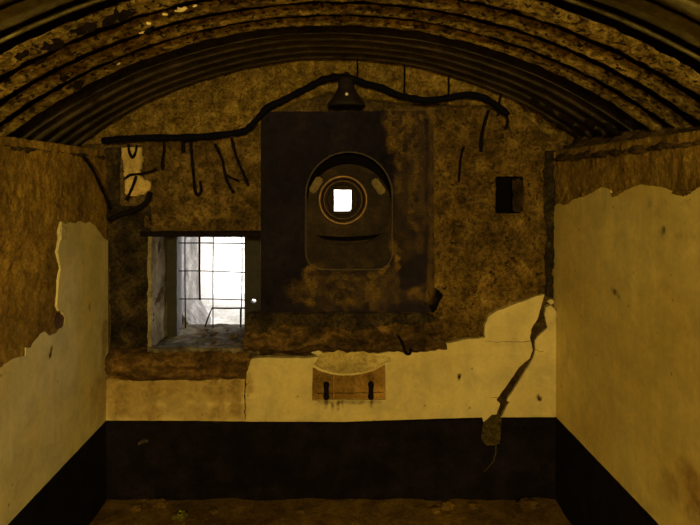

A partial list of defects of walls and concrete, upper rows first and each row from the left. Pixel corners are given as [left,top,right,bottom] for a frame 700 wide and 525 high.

peeling [0,132,261,367]
spalling [243,105,700,356]
crack [488,150,556,416]